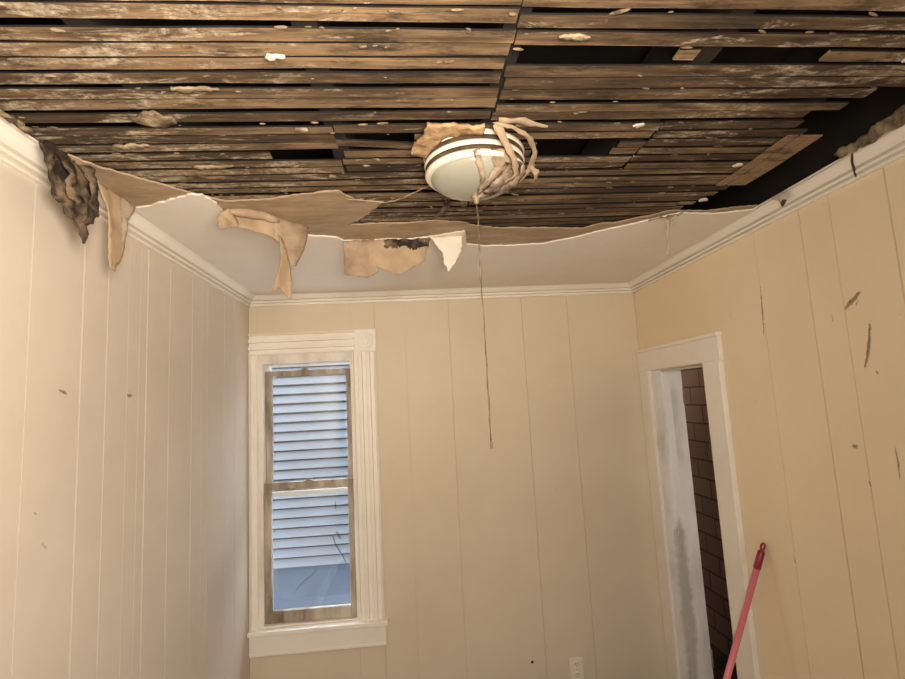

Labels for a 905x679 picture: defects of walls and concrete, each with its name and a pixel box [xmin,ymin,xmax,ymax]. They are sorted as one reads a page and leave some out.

water stain [38,140,100,244]
peeling [771,189,790,207]
peeling [430,235,463,272]